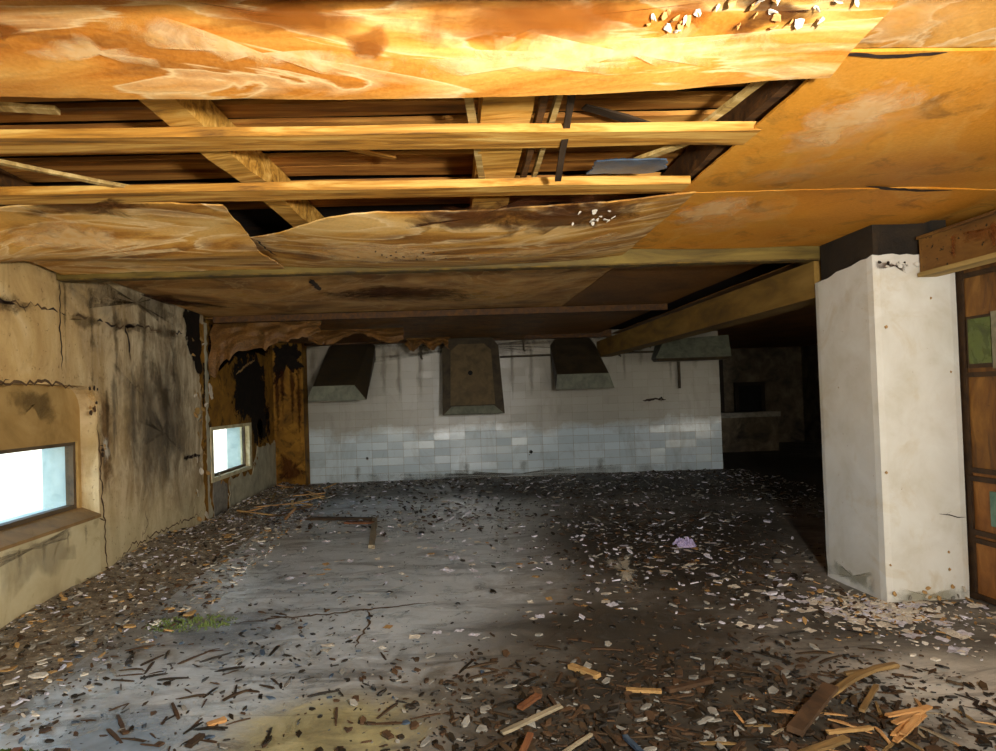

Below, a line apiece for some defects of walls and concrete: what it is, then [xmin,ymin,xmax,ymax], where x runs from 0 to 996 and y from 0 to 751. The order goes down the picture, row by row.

damp [444,0,710,74]
peeling [646,4,721,33]
crack [848,51,947,59]
crack [867,185,952,193]
damp [419,196,635,235]
damp [257,370,301,445]